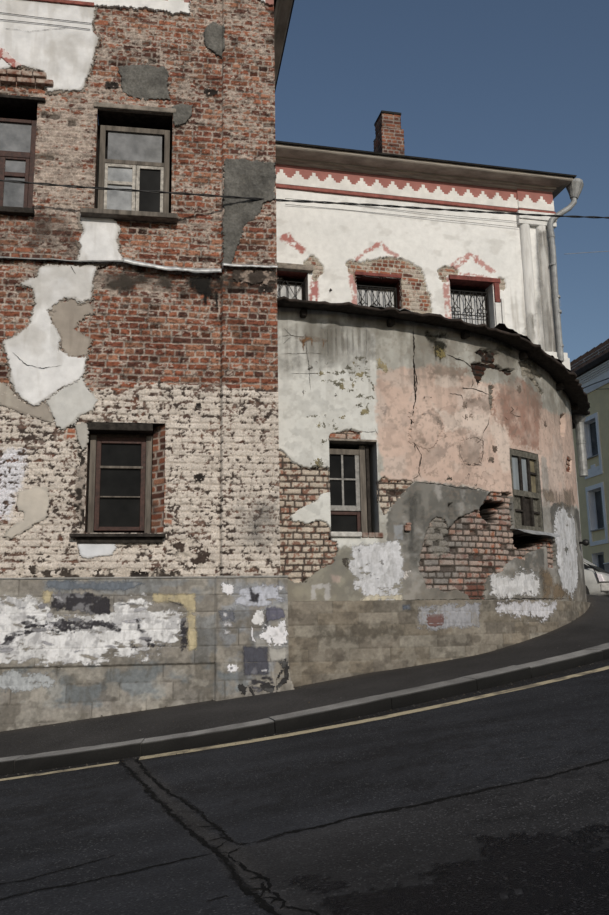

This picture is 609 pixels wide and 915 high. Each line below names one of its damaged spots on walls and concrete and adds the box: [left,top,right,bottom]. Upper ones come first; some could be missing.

flaking render [0,0,101,96]
flaking render [345,257,432,314]
flaking render [437,266,458,282]
peeling [0,212,210,693]
spalling [307,415,362,445]
crack [411,332,487,491]
crack [459,408,520,466]
spalling [471,350,542,410]
spalling [219,450,578,692]
crack [199,826,320,915]
leakage [292,825,609,915]